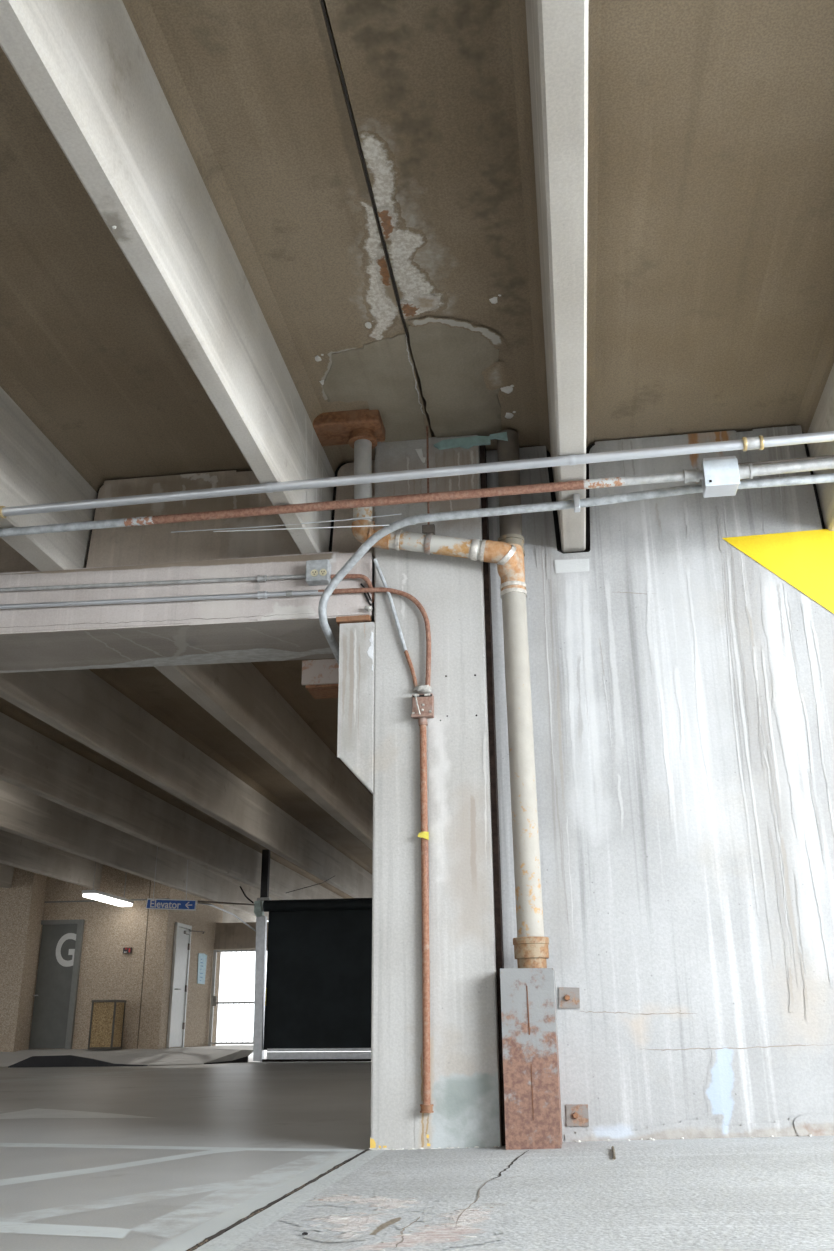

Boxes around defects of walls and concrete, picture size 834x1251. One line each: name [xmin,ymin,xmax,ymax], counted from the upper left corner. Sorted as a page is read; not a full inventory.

crack [307,0,408,337]
damp [325,0,534,361]
corrosion [414,1031,439,1149]
crack [392,1217,420,1250]
crack [456,1150,529,1224]